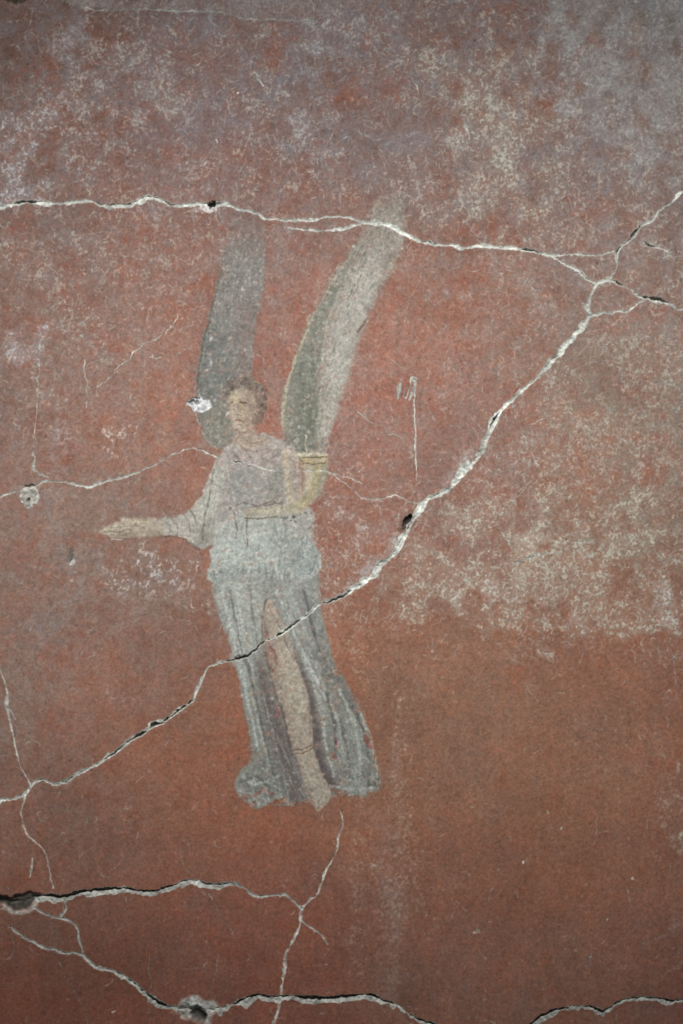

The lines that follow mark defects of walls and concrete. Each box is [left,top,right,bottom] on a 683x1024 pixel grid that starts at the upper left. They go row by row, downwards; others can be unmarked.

flaking render [185,393,213,413]
crack [0,184,683,810]
crack [0,803,445,1024]
crack [524,992,683,1024]